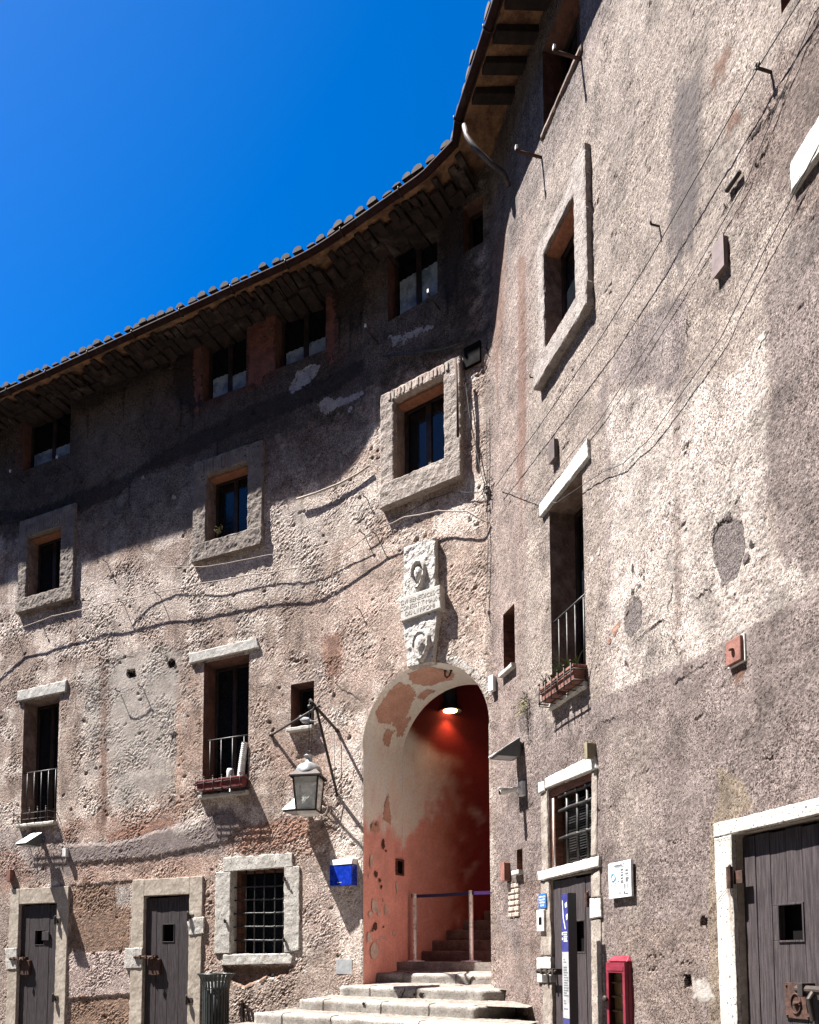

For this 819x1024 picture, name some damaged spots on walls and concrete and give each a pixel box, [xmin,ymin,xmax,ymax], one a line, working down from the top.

peeling [289,294,337,394]
flaking render [388,324,434,347]
peeling [376,653,491,747]
flaking render [358,755,398,973]